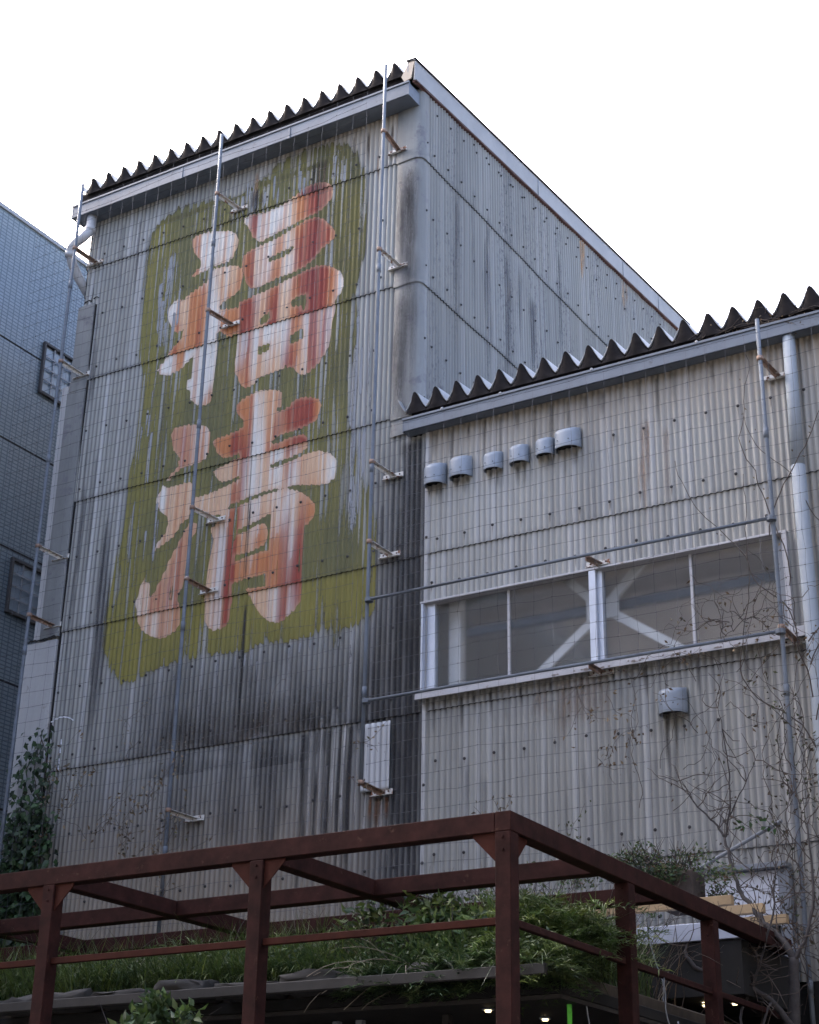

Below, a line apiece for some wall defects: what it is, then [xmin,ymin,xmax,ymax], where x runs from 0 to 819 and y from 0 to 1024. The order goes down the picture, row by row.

leakage [287,693,384,836]
leakage [390,443,422,824]